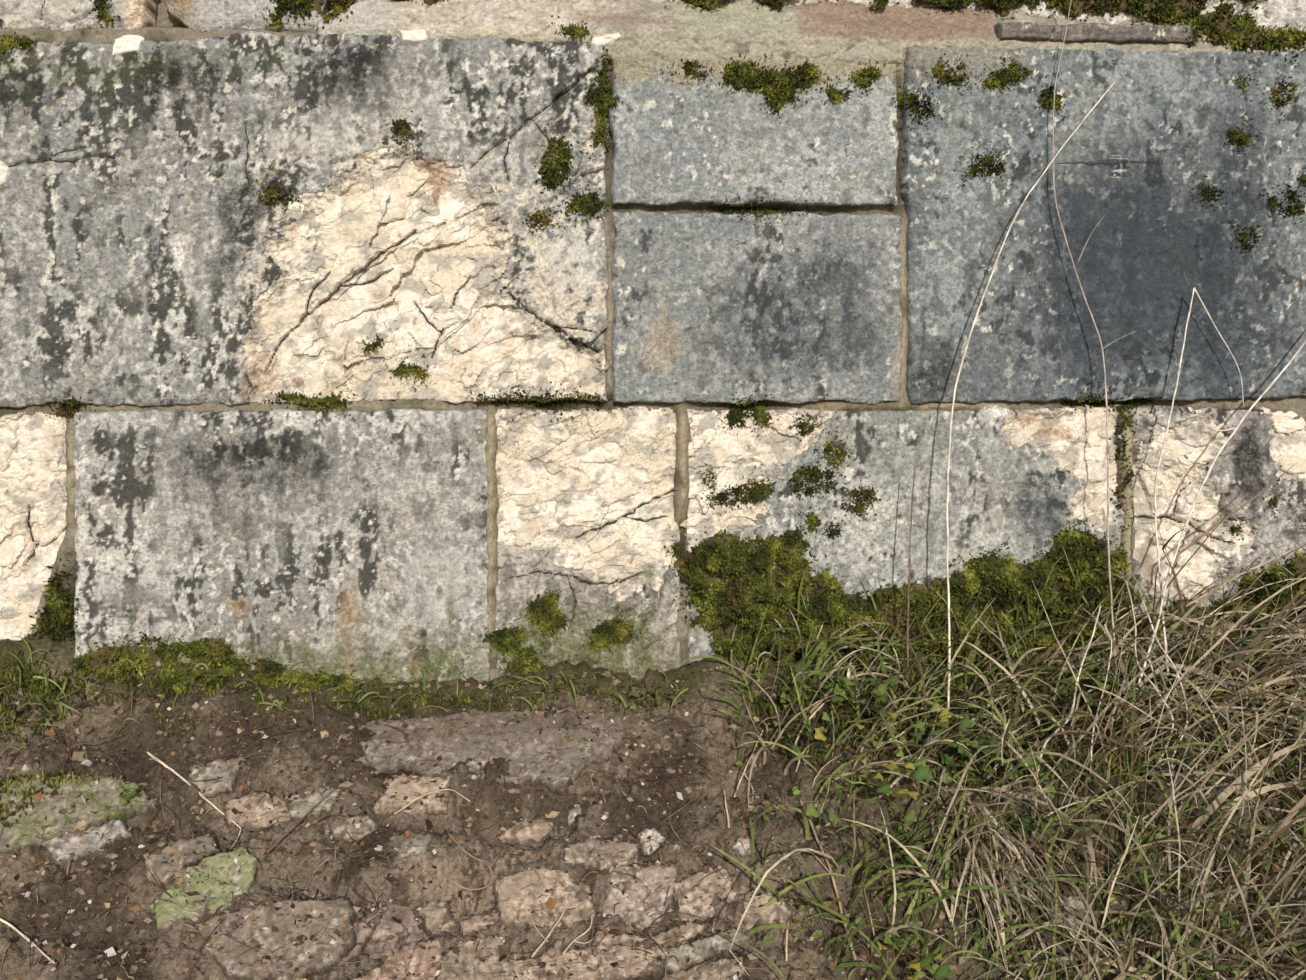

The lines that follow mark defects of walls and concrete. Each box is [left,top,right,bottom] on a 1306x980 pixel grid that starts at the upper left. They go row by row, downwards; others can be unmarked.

crack [8,148,116,167]
crack [267,231,417,369]
crack [415,277,470,357]
crack [576,490,679,538]
crack [1130,482,1233,569]
crack [506,570,643,622]